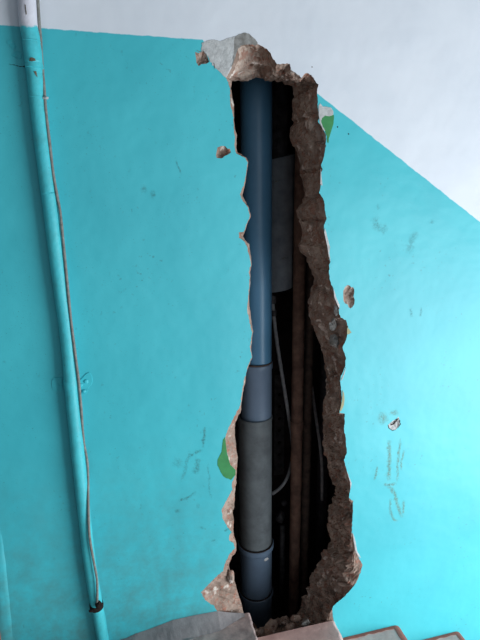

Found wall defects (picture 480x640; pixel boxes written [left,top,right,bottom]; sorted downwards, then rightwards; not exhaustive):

spalling [195,33,362,634]
spalling [388,417,401,431]